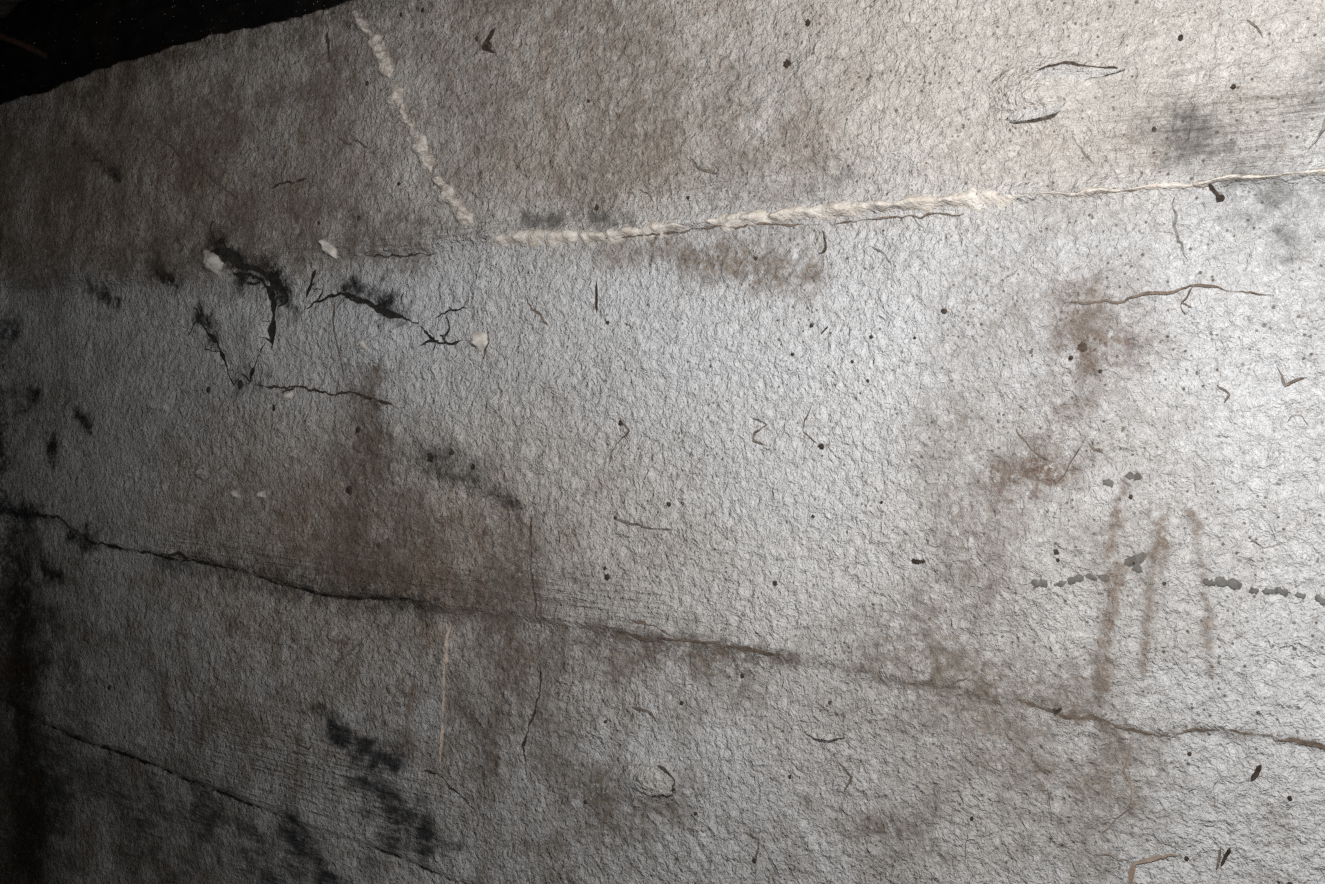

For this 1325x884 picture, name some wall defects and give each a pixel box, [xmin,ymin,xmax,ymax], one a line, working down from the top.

damp [0,5,475,289]
crack [154,133,490,408]
damp [485,167,1325,275]
crack [1064,198,1274,314]
crack [21,512,442,681]
damp [279,812,338,884]
damp [317,705,434,856]
damp [439,626,467,775]
crack [521,664,542,764]
crack [615,620,784,655]
damp [1089,570,1123,703]
crack [1013,698,1325,884]